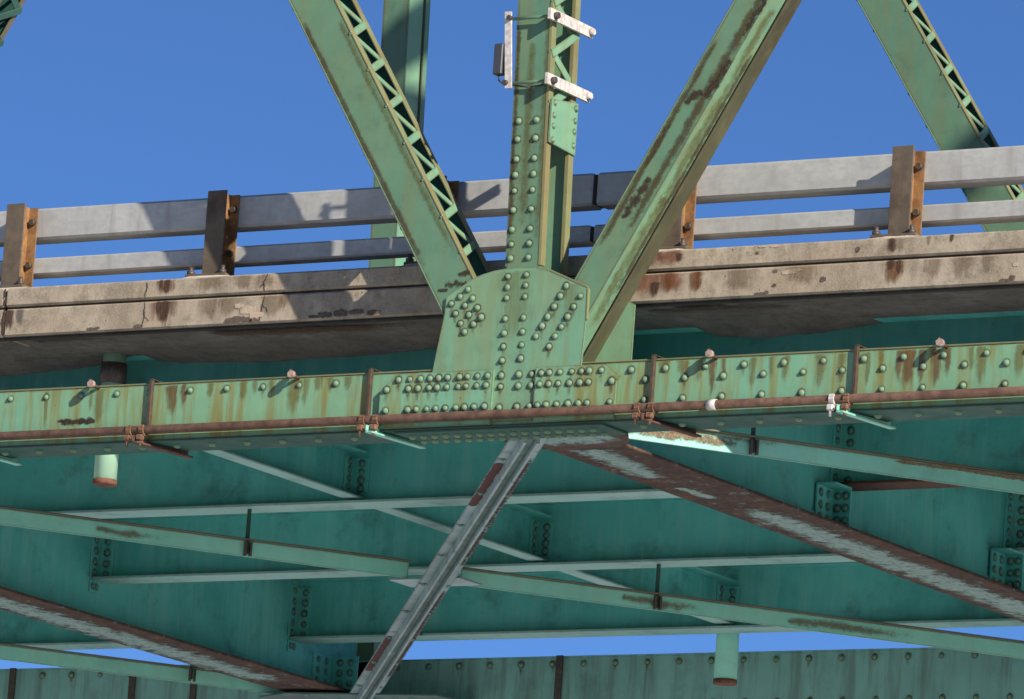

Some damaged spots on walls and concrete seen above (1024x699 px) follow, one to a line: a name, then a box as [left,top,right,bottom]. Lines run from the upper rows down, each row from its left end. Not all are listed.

rust [601,0,766,288]
rust [637,250,700,296]
rust [886,238,903,280]
rust [153,280,174,321]
spalling [224,303,264,323]
rust [709,359,726,388]
rust [896,348,951,382]
rust [167,384,186,410]
rust [58,417,95,425]
rust [640,431,749,446]
rust [461,462,531,565]
rust [789,619,882,633]